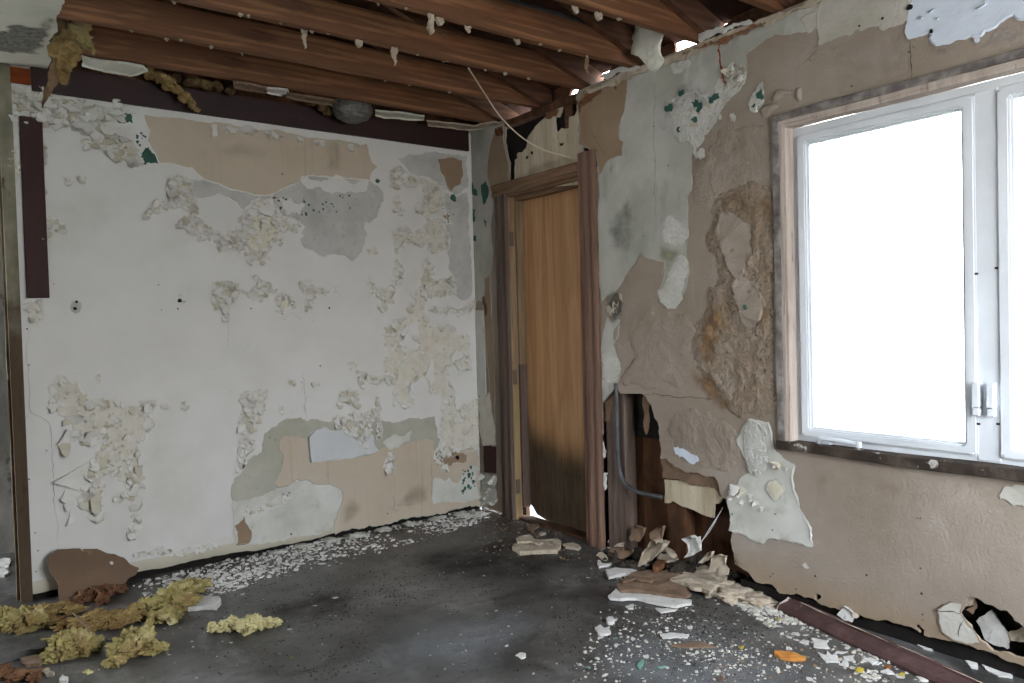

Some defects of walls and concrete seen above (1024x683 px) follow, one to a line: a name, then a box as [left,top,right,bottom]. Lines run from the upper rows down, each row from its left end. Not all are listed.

peeling [721,62,747,88]
peeling [8,85,498,559]
peeling [614,253,665,345]
hole [634,394,660,439]
peeling [727,484,764,512]
peeling [937,598,1024,656]